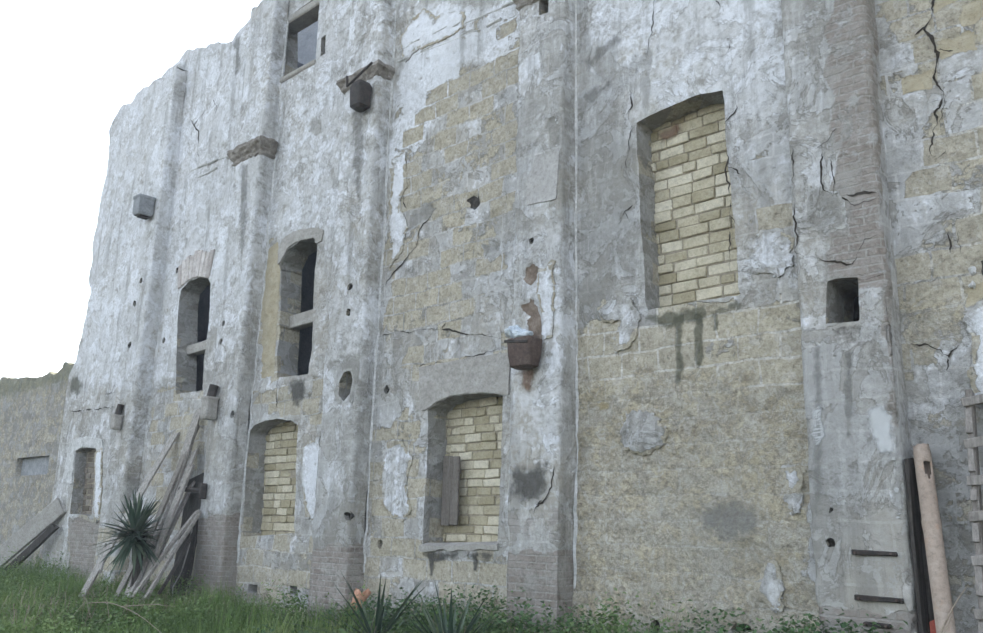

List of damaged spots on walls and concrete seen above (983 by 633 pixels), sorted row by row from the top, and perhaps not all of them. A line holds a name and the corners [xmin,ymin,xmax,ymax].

crack [915,0,953,159]
peeling [387,151,436,268]
spalling [467,195,480,210]
crack [791,152,883,280]
crack [817,128,876,205]
peeling [521,259,556,340]
water stain [674,317,683,383]
water stain [694,314,703,367]
crack [913,343,960,369]
peeling [963,261,983,395]
peeling [380,439,413,522]
water stain [510,469,544,499]